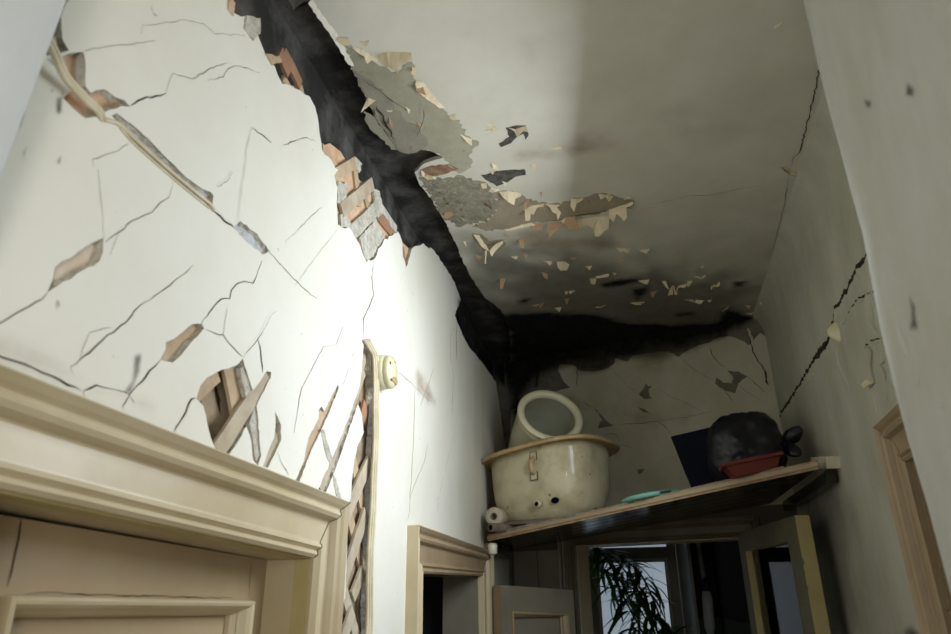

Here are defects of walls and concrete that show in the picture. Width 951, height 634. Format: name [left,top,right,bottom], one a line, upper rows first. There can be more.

flaking render [46,29,212,209]
crack [214,126,309,228]
peeling [289,0,634,265]
crack [0,270,189,409]
flaking render [160,324,202,362]
crack [175,398,196,432]
flaking render [197,363,280,467]
crack [202,229,338,372]
water stain [459,302,753,421]
water stain [602,279,647,310]
crack [606,254,875,446]
flaking render [296,343,373,634]